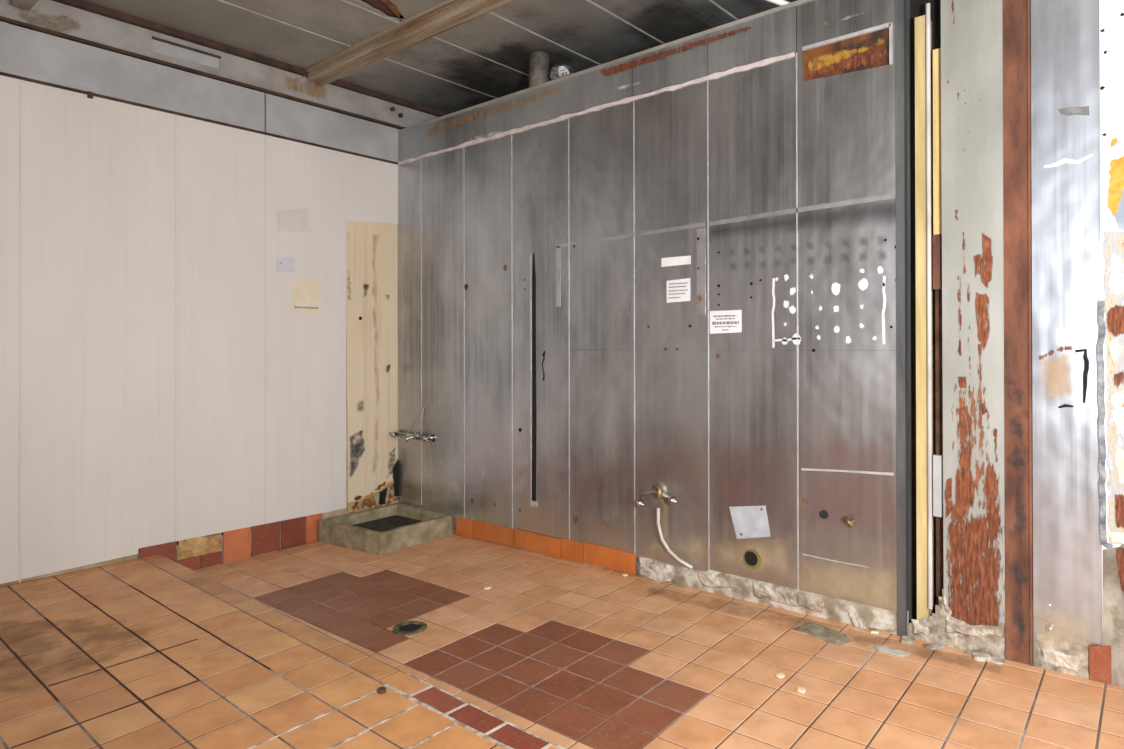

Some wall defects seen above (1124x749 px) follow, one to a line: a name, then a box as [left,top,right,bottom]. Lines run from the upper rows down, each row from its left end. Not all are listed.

rust [601,27,752,76]
leakage [644,4,710,46]
rust [807,41,887,77]
rust [945,232,1025,631]
peeling [1097,133,1124,687]
spalling [622,557,1005,665]